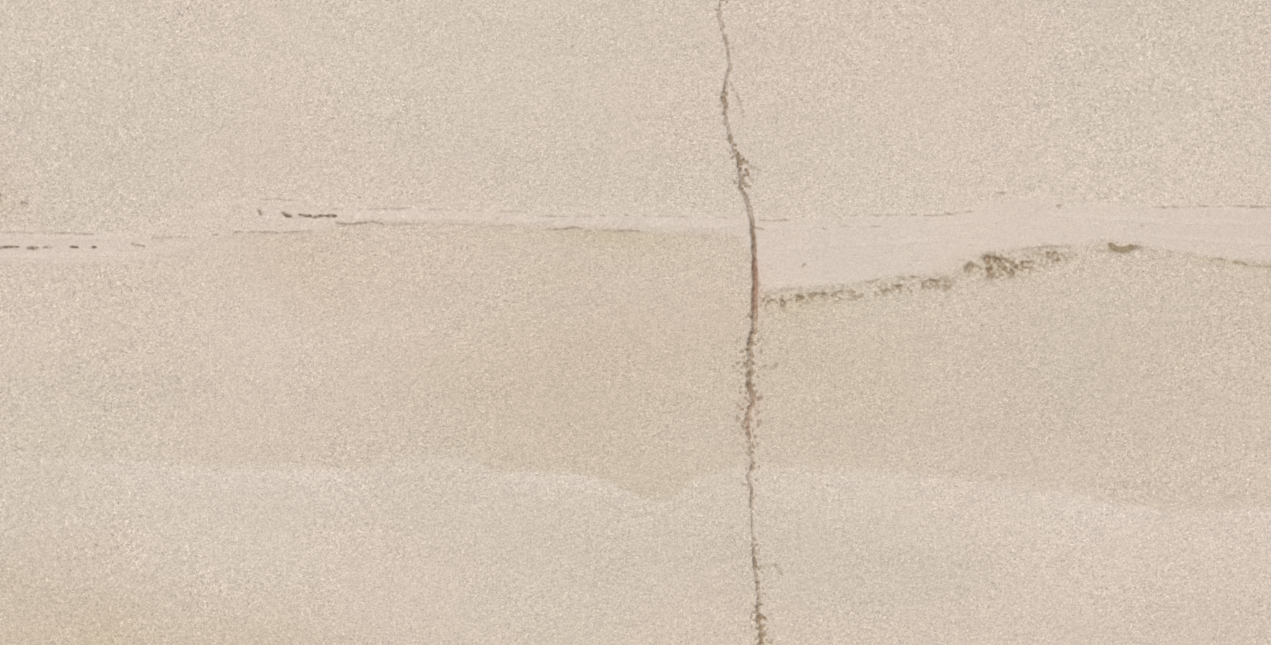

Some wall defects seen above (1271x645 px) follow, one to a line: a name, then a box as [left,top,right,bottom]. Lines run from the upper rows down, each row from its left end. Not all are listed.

spalling [757,244,1080,314]
spalling [1104,241,1146,255]